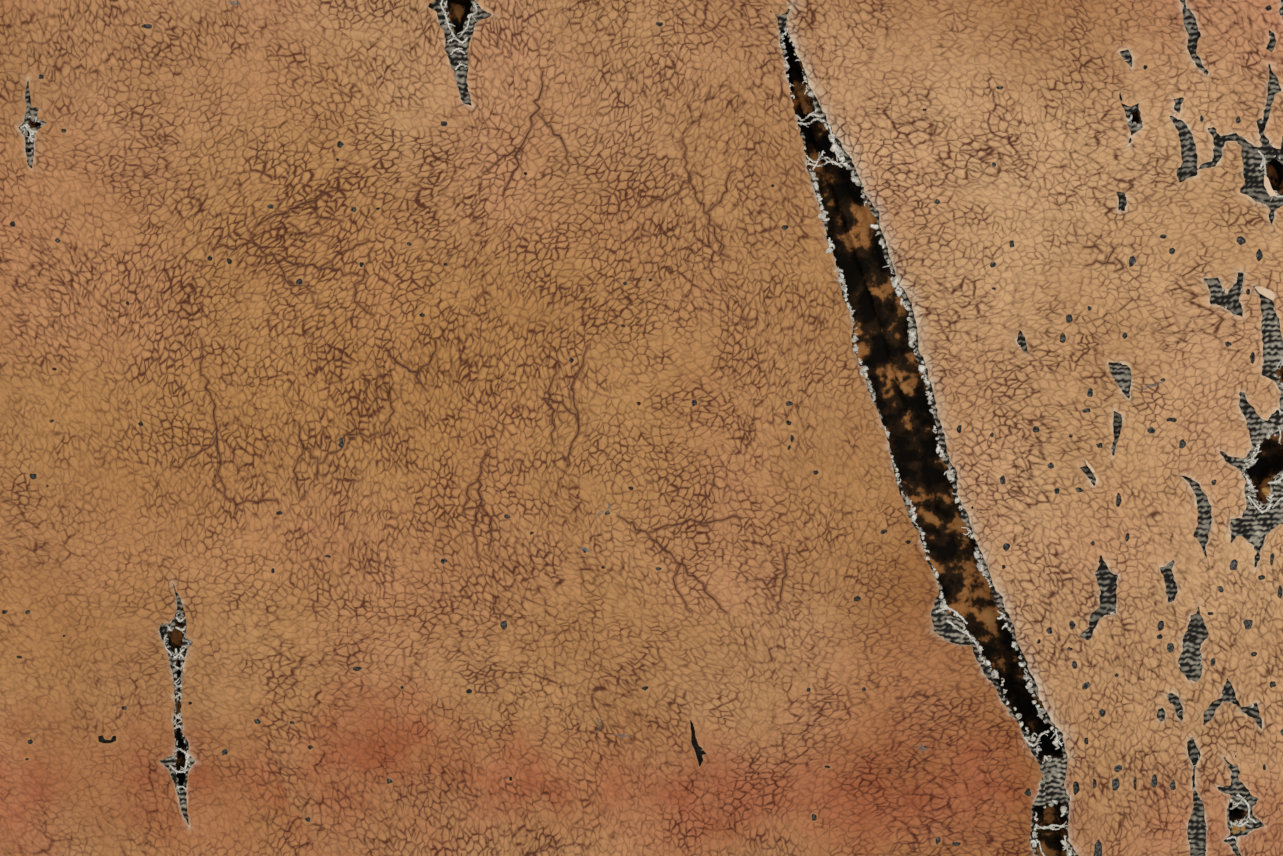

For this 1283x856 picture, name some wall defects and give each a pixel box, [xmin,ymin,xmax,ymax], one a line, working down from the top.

peeling [1170,30,1283,225]
peeling [1108,362,1131,398]
peeling [1096,411,1122,456]
peeling [1204,272,1283,580]
peeling [1054,460,1096,494]
peeling [1182,476,1216,557]
crack [756,551,787,606]
peeling [1160,560,1177,602]
peeling [1157,606,1215,682]
peeling [1157,693,1183,721]
peeling [1203,678,1262,728]
peeling [1187,737,1207,856]